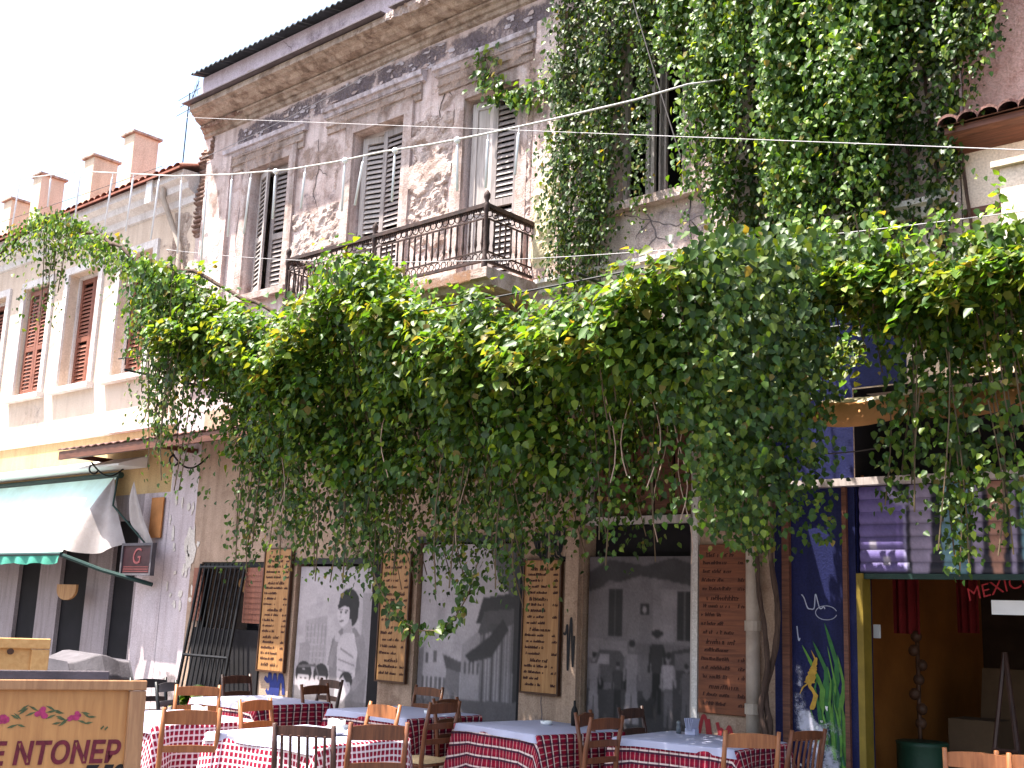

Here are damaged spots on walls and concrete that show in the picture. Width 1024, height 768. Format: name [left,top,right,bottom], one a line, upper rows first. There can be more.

peeling [491,10,534,34]
peeling [379,43,471,85]
peeling [244,90,338,138]
spalling [404,109,454,266]
spalling [290,202,340,291]
crack [625,196,705,257]
peeling [166,492,200,611]